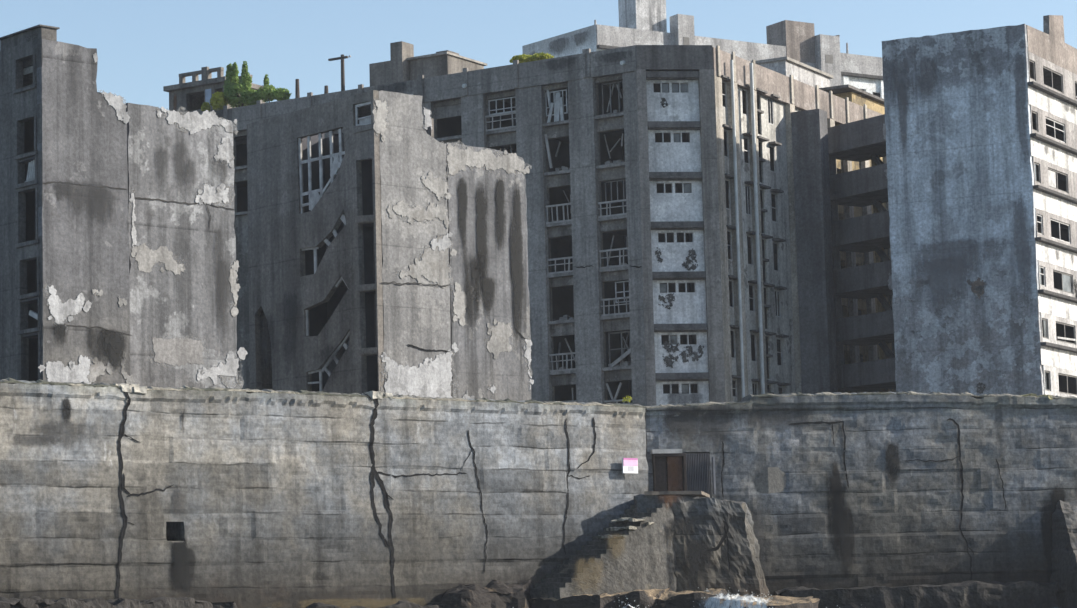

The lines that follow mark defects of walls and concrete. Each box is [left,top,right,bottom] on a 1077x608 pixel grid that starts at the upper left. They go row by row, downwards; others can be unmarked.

peeling [157,107,238,168]
peeling [46,285,103,332]
peeling [381,342,474,399]
peeling [387,144,530,326]
damp [458,178,524,337]
crack [115,392,173,599]
crack [364,393,488,603]
crack [562,417,596,554]
damp [826,462,855,572]
damp [886,444,900,483]
crack [908,418,974,580]
damp [1041,486,1065,583]